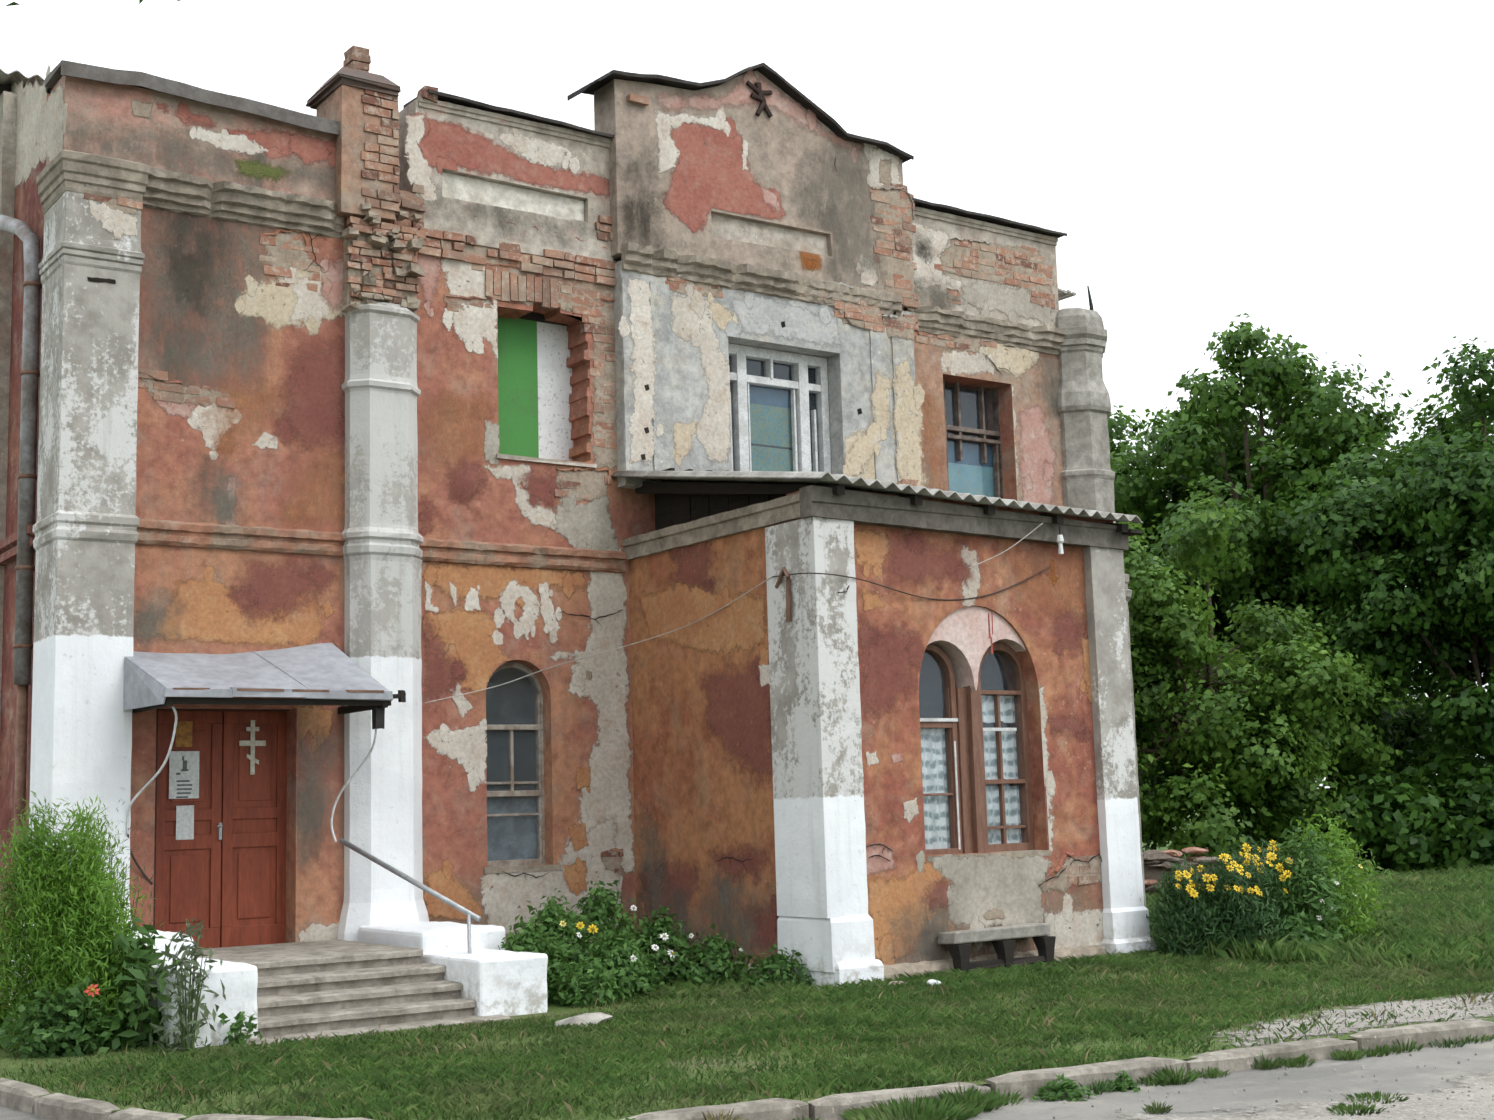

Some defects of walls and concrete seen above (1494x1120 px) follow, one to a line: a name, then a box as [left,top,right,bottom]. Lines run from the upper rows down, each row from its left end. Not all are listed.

leakage [142,209,271,381]
peeling [234,229,343,336]
peeling [393,66,1057,551]
spalling [138,368,242,460]
peeling [854,529,890,651]
peeling [960,545,981,606]
peeling [422,563,770,954]
peeling [866,687,1104,965]